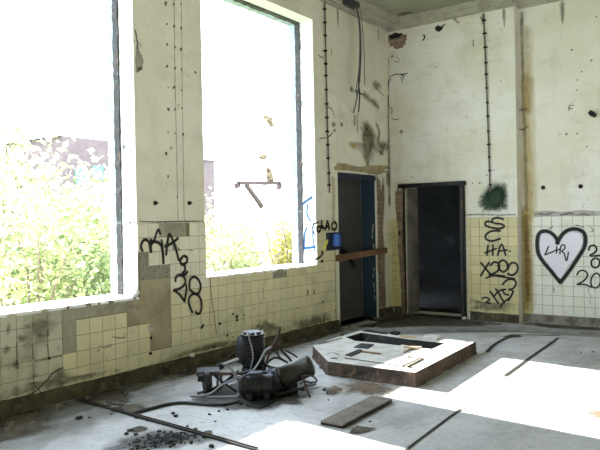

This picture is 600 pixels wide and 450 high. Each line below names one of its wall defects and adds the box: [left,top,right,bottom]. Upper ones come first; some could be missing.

flaking render [388,32,407,62]
water stain [351,115,386,166]
peeling [62,196,171,355]